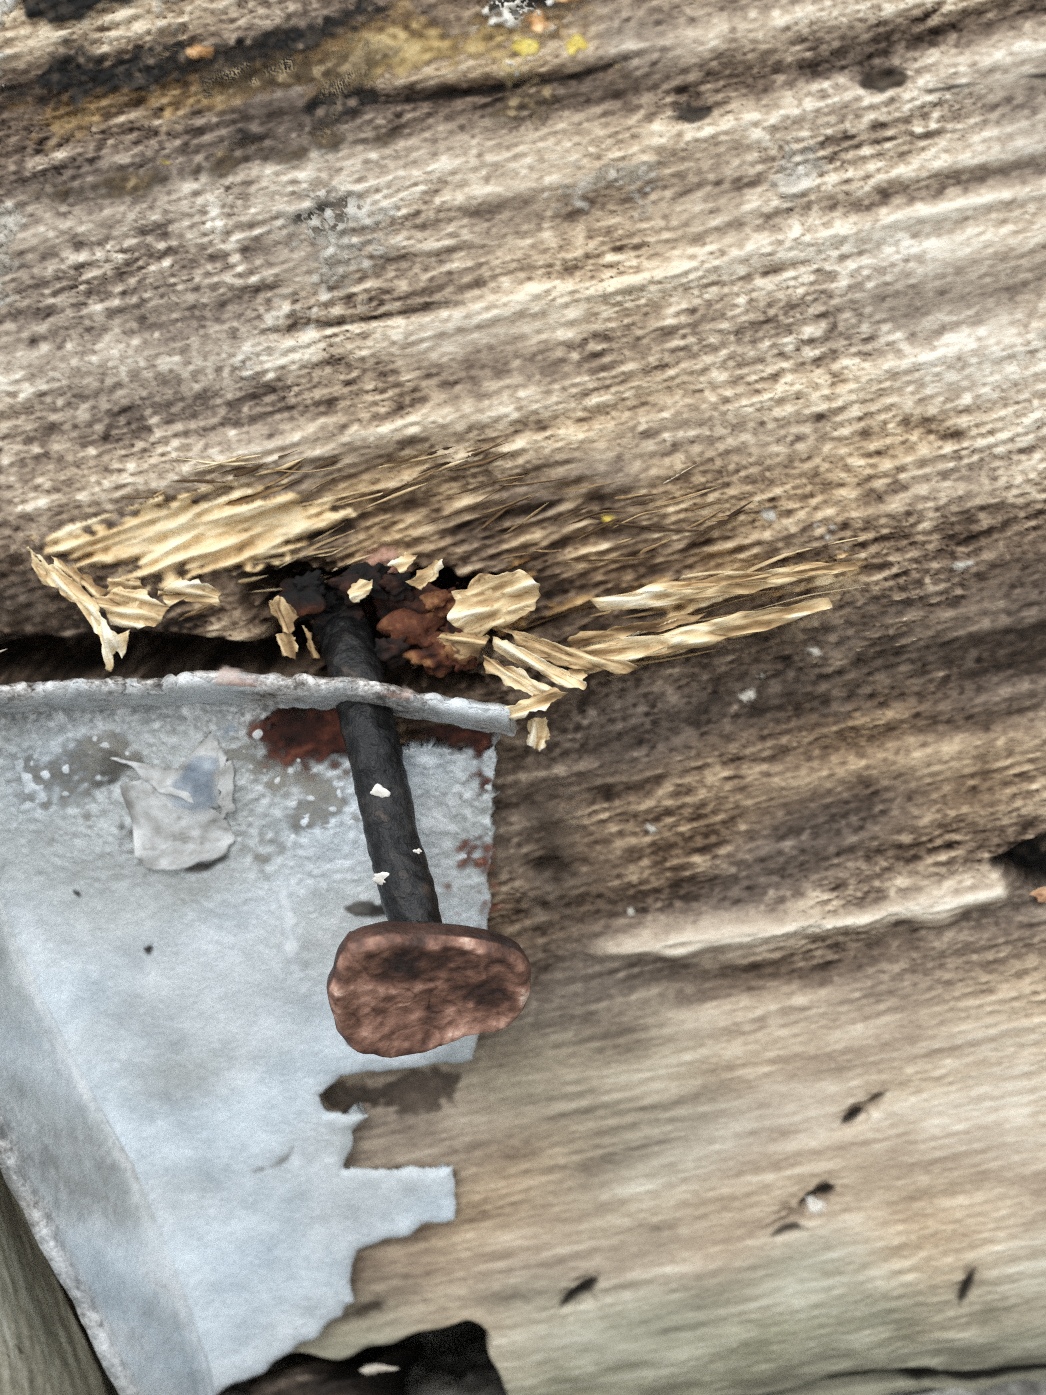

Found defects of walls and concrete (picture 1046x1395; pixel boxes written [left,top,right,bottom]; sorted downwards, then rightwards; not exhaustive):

peeling [26,546,222,672]
peeling [268,596,322,660]
peeling [347,579,373,603]
corrosion [363,596,376,618]
corrosion [365,547,447,590]
peeling [387,552,444,590]
corrosion [216,668,255,687]
peeling [437,561,859,752]
corrosion [248,708,348,769]
corrosion [414,719,495,790]
corrosion [457,840,493,869]